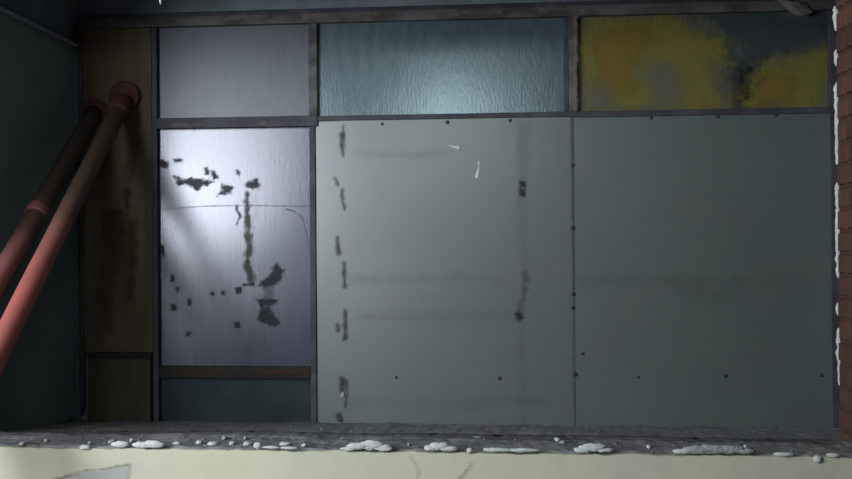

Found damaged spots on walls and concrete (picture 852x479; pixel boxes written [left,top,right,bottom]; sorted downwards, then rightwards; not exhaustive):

peeling [173,167,233,195]
peeling [259,264,284,287]
peeling [257,299,279,326]